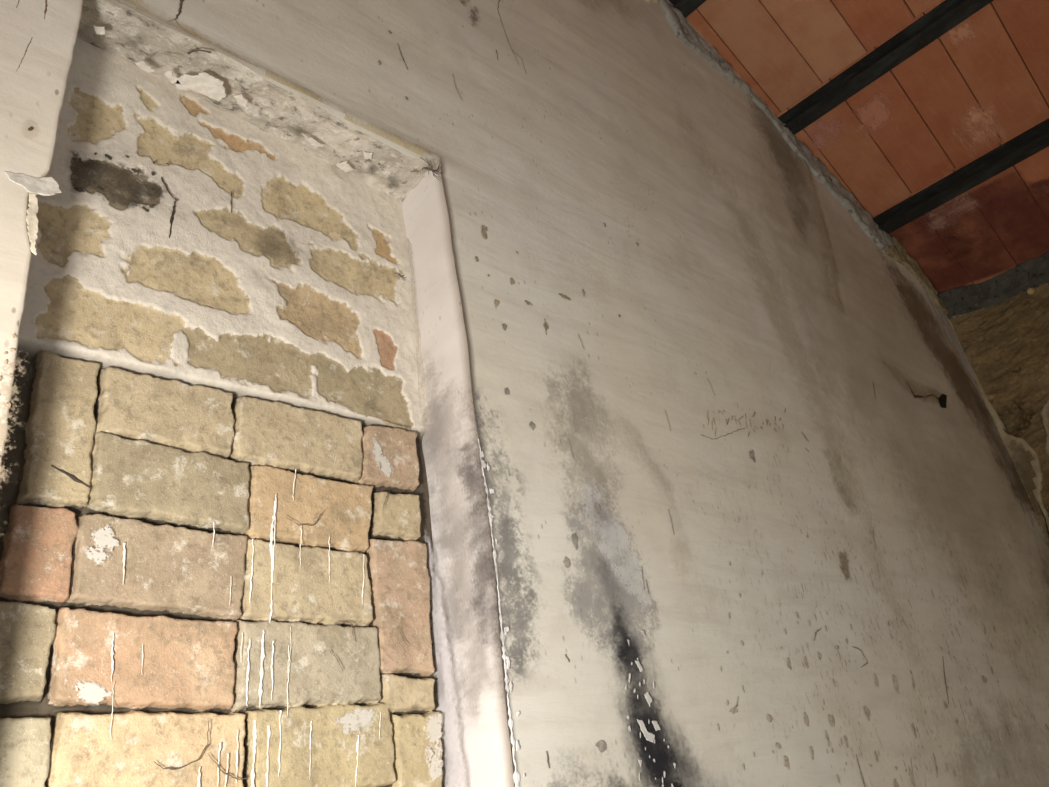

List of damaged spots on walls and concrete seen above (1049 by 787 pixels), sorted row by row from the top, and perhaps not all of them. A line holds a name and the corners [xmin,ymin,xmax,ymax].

crack [170,0,186,31]
spalling [77,0,440,203]
spalling [3,171,62,255]
spalling [950,283,1049,514]